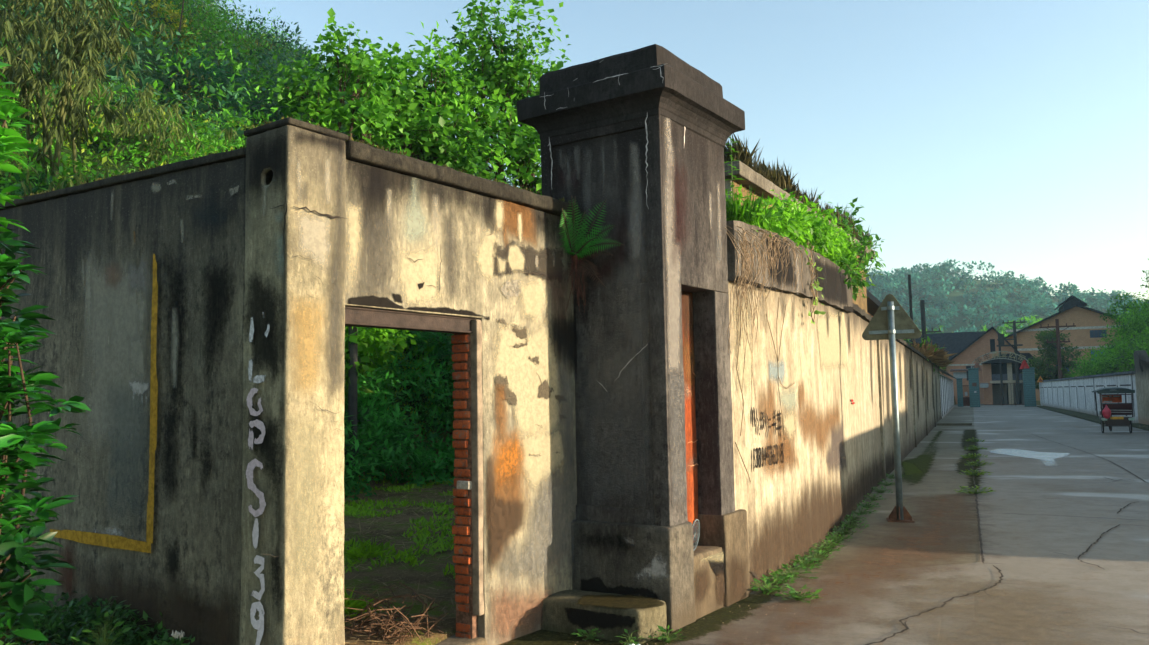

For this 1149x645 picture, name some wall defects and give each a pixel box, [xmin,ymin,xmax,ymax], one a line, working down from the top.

damp [161,261,189,494]
damp [247,405,279,488]
damp [202,133,390,388]
damp [446,218,456,294]
flaking render [348,231,564,487]
rust [488,387,524,531]
damp [736,303,752,389]
damp [759,384,846,475]
damp [816,260,850,366]
damp [696,454,895,603]
crack [1050,477,1135,570]
crack [865,565,1004,645]